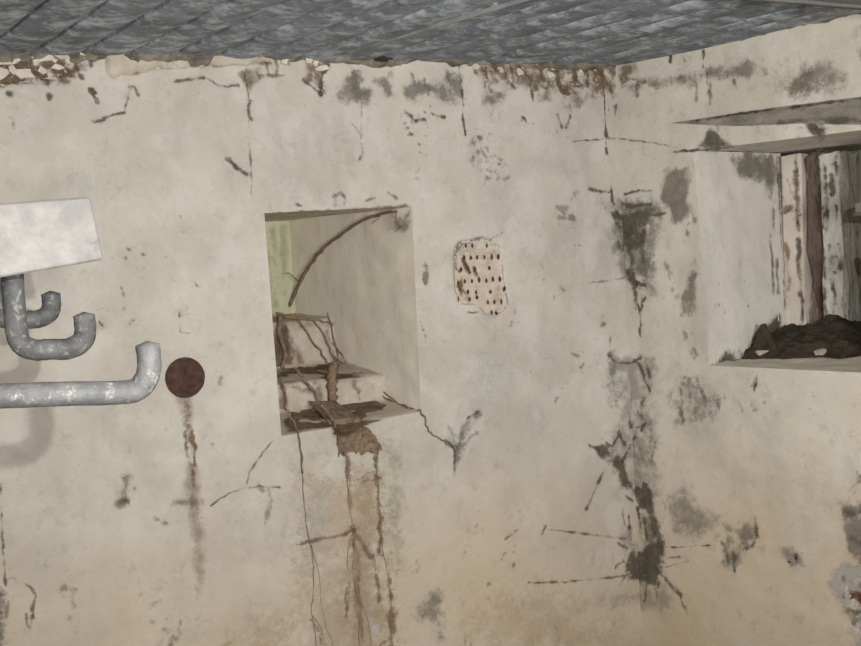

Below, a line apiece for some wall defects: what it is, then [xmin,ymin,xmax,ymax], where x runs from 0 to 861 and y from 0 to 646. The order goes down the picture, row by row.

flaking render [0,52,99,103]
water stain [338,71,371,102]
water stain [405,64,632,107]
water stain [702,50,752,83]
water stain [588,169,696,311]
spalling [453,237,508,316]
water stain [608,353,651,405]
corrosion [185,431,197,486]
water stain [589,420,685,607]
water stain [723,525,758,572]
water stain [842,506,861,564]
spalling [829,564,861,631]